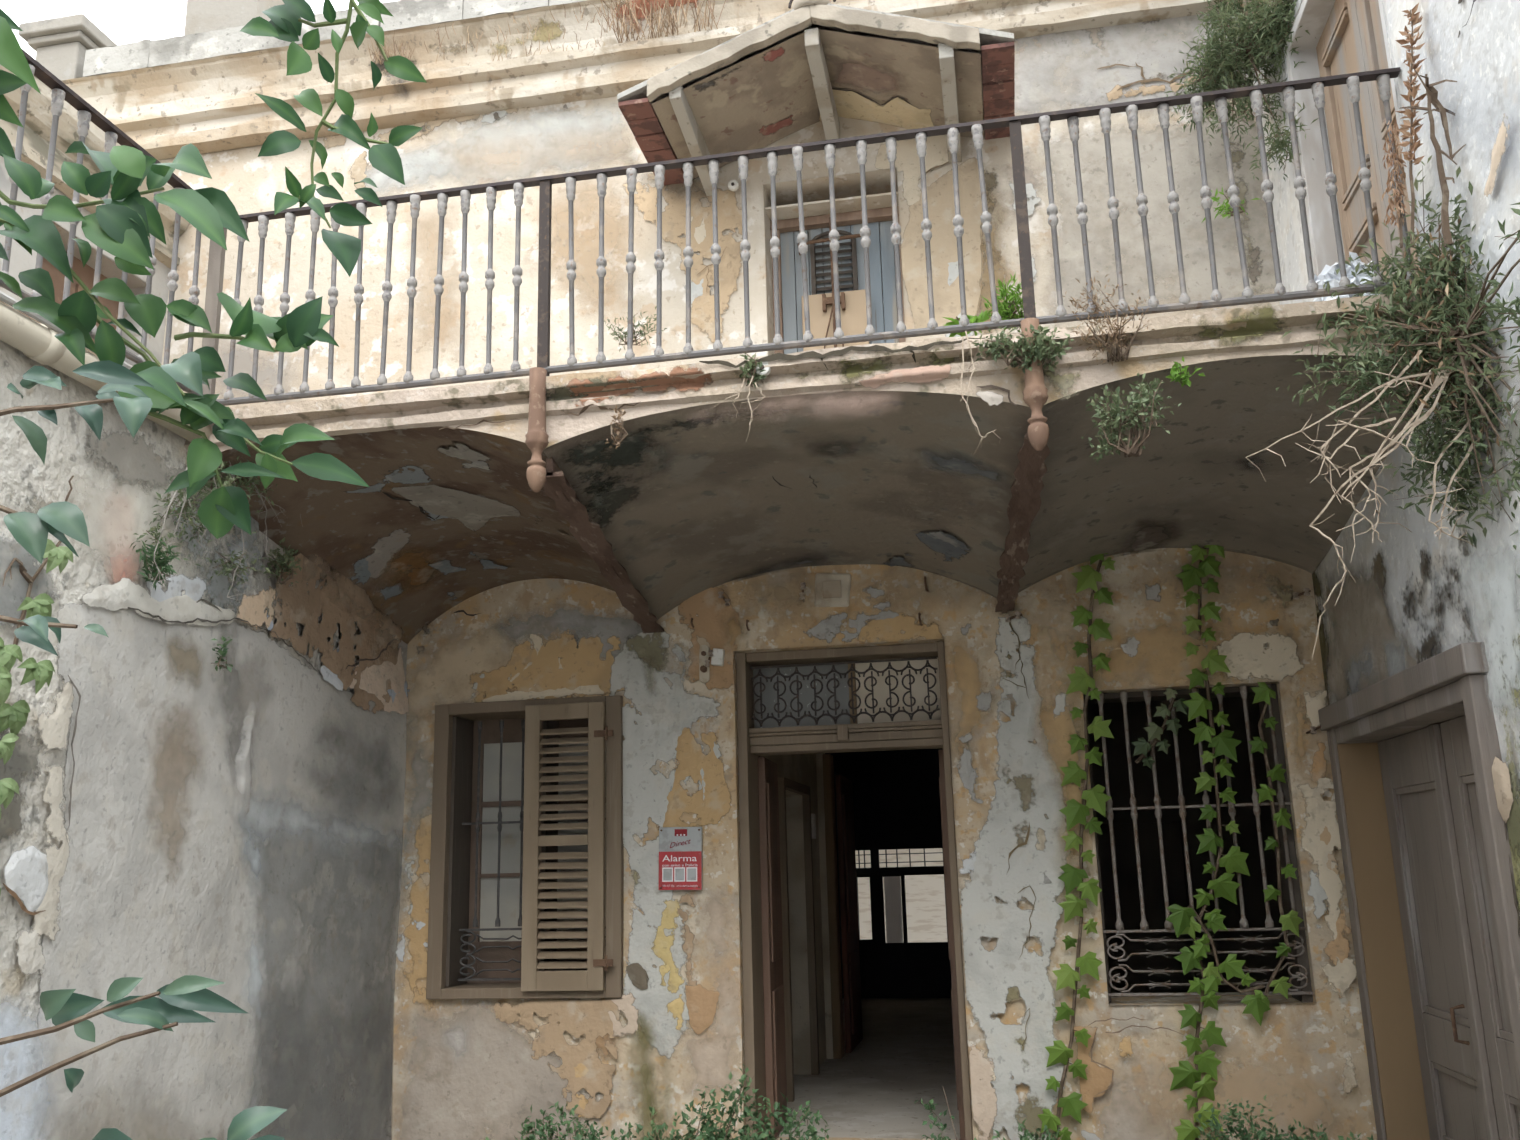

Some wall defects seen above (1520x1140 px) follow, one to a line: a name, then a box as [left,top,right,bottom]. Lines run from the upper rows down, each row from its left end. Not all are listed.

peeling [437,443,490,470]
peeling [346,466,543,600]
peeling [267,529,411,715]
peeling [472,634,604,702]
peeling [1053,693,1066,717]
peeling [1217,619,1304,681]
peeling [960,852,977,874]
peeling [1297,690,1357,998]
leakage [1507,772,1520,859]
spalling [659,894,720,1035]
leakage [265,1010,391,1140]